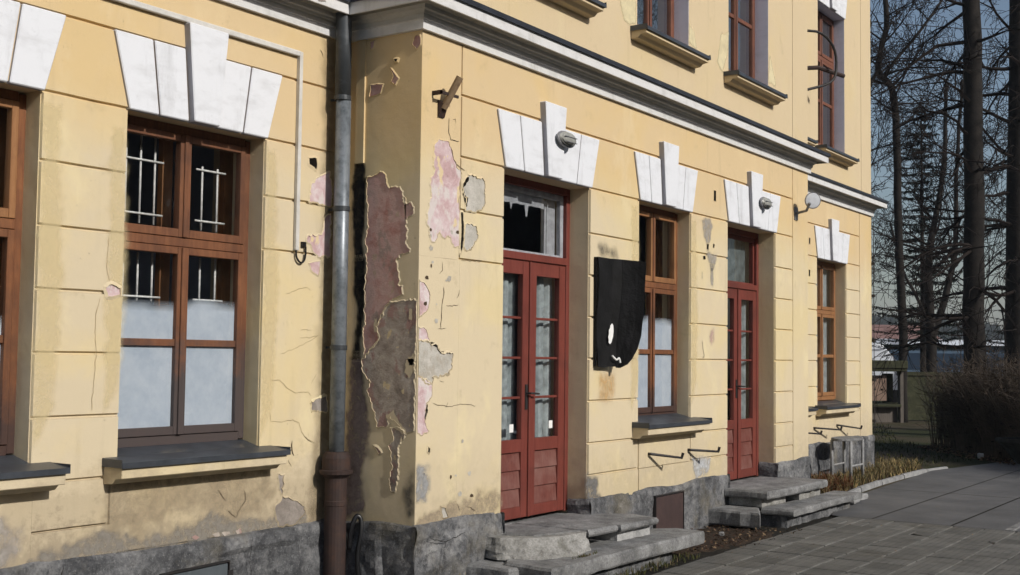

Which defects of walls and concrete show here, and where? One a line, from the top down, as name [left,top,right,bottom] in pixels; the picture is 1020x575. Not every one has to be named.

peeling [305,155,333,277]
leakage [327,99,336,216]
leakage [323,259,333,393]
flaking render [361,138,486,493]
leakage [320,414,329,441]
spalling [273,473,306,528]